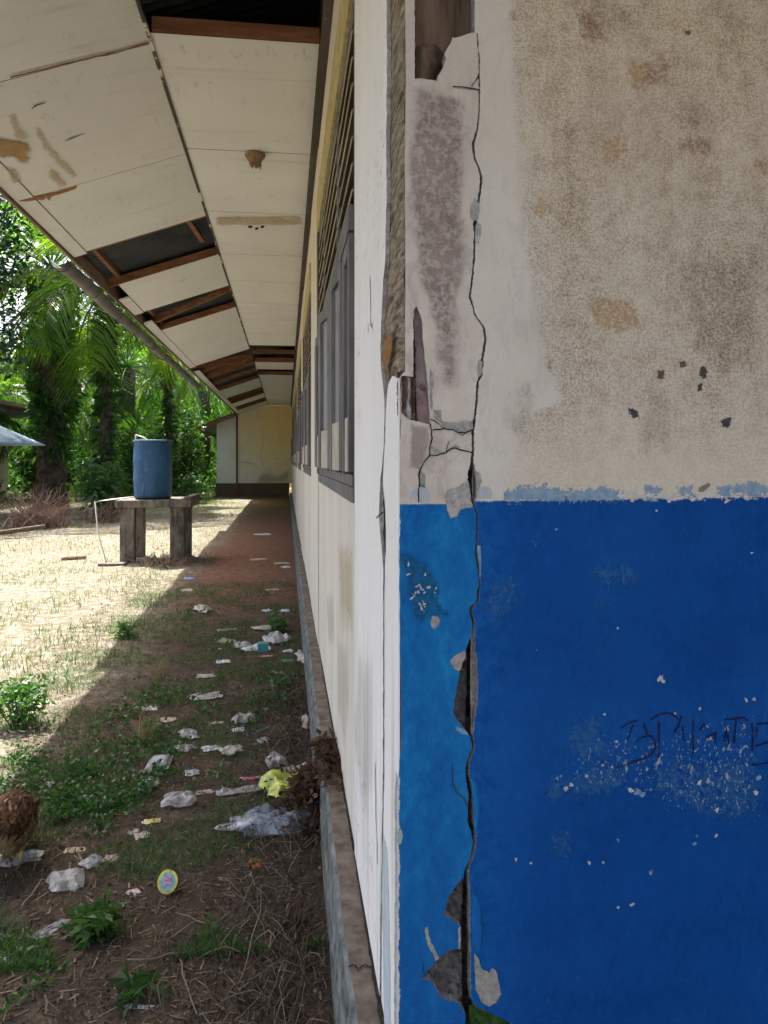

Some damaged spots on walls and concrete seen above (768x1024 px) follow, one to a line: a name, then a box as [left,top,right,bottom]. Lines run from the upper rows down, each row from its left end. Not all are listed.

crack [453,72,480,90]
damp [0,118,29,182]
damp [39,132,76,186]
spalling [382,0,473,455]
damp [412,94,461,348]
damp [698,366,708,392]
crack [418,419,475,505]
peeling [444,471,768,518]
crack [452,614,476,840]
peeling [556,715,761,838]
crack [423,869,482,1009]
spalling [474,954,501,1007]